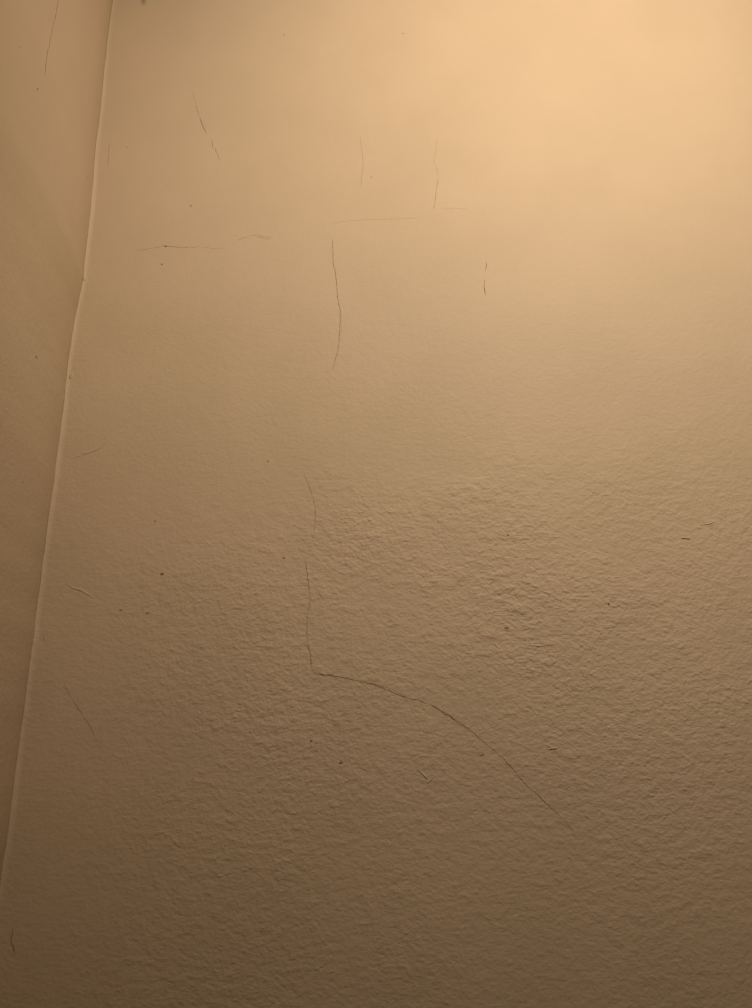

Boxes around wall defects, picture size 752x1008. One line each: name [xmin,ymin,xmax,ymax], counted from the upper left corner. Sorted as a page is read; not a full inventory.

crack [304,562,573,831]